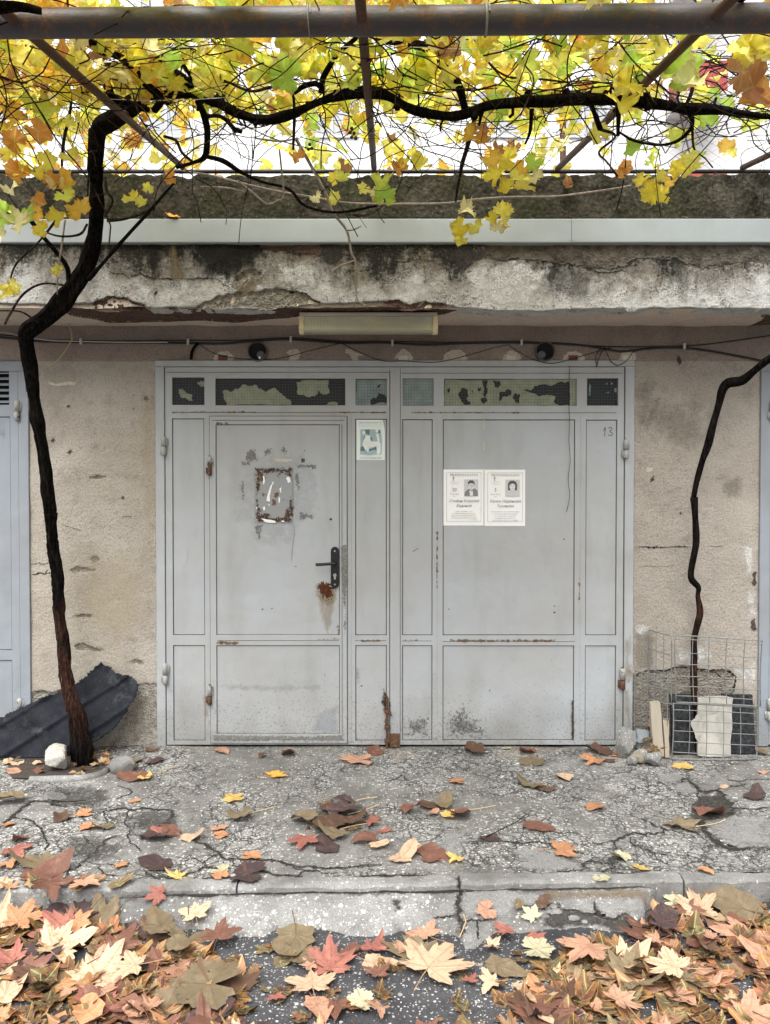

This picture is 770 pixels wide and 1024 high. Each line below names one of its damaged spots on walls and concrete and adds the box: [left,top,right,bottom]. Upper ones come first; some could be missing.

damp [135,283,155,304]
damp [148,244,262,302]
peeling [67,268,456,323]
damp [278,264,315,285]
damp [322,244,342,265]
crack [484,256,769,280]
peeling [223,380,338,405]
peeling [403,379,576,406]
rust [318,545,348,639]
rust [381,689,398,747]
flaking render [633,665,735,751]
crack [119,877,656,940]